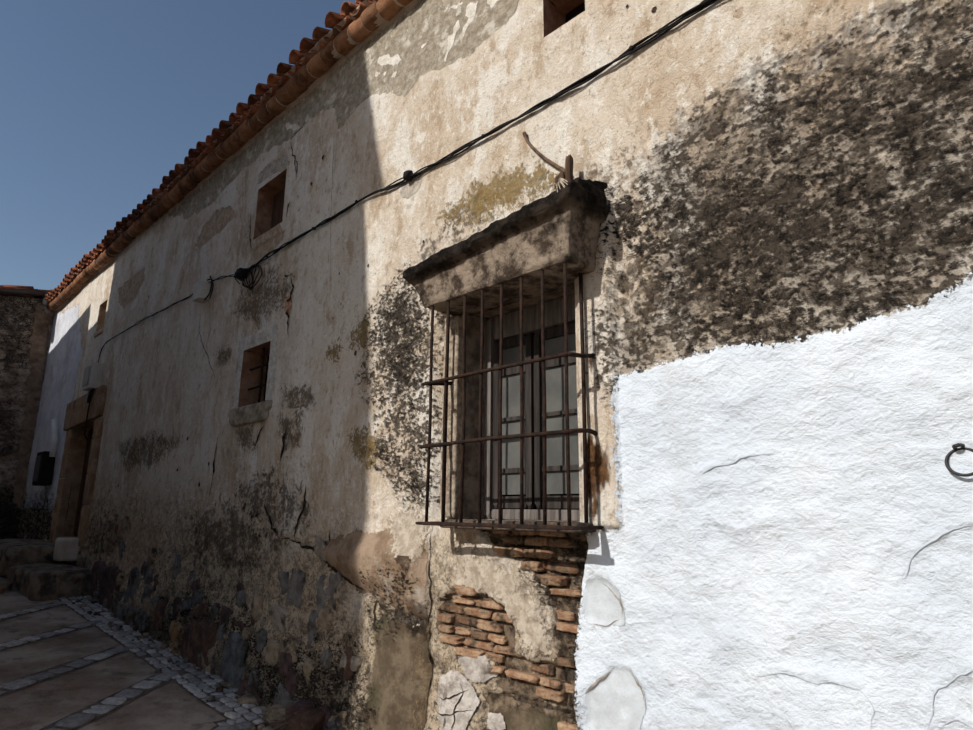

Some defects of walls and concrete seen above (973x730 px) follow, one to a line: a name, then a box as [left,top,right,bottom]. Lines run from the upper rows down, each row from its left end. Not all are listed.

water stain [417,184,502,261]
water stain [582,0,973,400]
water stain [147,466,434,730]
crack [264,487,378,632]
water stain [355,263,446,512]
spalling [436,529,646,730]
rust [580,435,610,519]